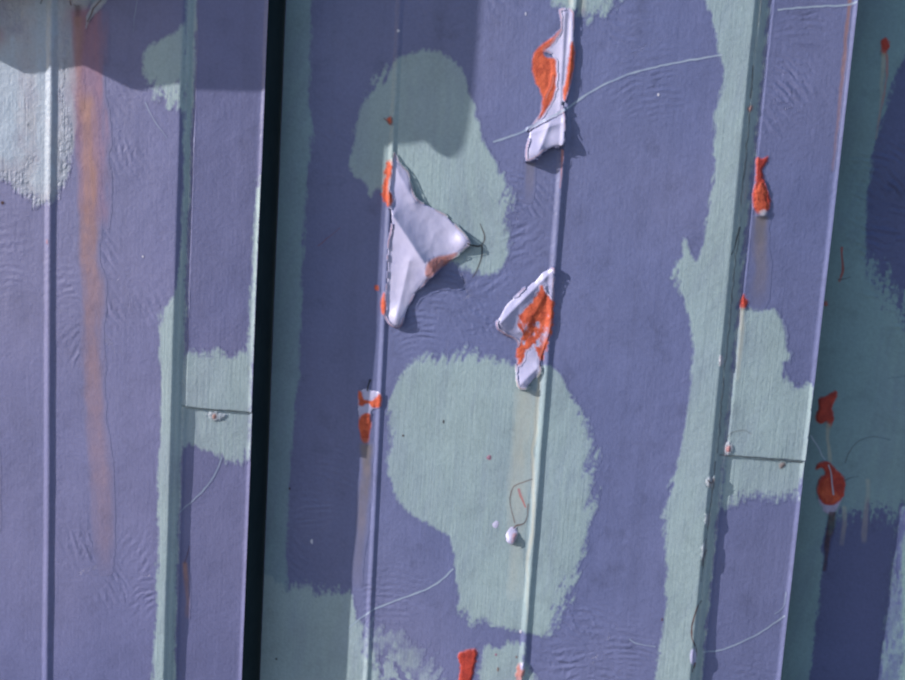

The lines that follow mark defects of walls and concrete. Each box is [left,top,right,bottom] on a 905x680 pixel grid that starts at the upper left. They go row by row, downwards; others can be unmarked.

peeling [523,0,588,204]
rust [61,1,116,576]
peeling [373,152,471,329]
rust [734,154,773,383]
peeling [492,266,557,634]
rust [810,389,859,572]
rust [456,646,479,680]